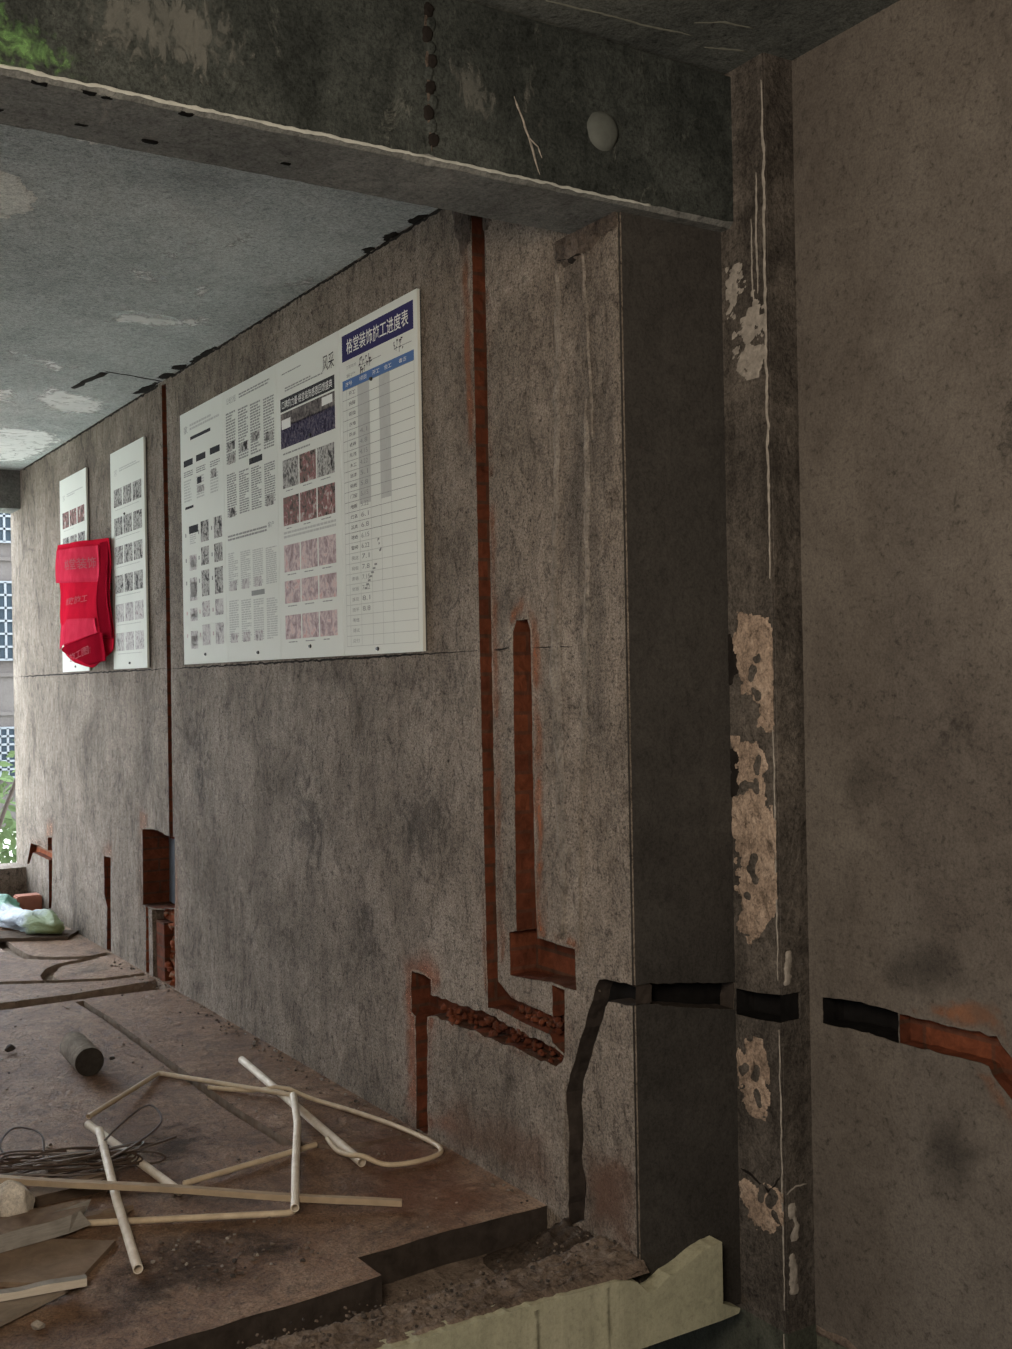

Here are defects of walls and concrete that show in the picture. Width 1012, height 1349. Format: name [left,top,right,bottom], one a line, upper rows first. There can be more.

peeling [725,262,765,381]
peeling [728,612,778,944]
peeling [736,1036,770,1121]
crack [741,1168,805,1195]